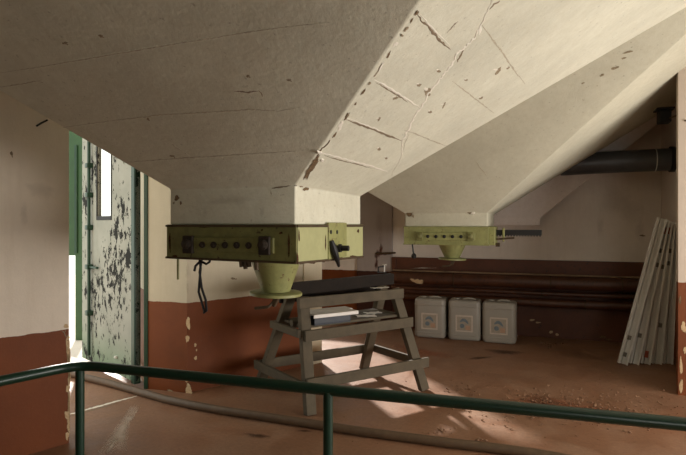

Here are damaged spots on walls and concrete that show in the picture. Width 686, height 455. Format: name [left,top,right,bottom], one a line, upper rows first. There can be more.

spalling [354,10,419,105]
crack [322,0,525,175]
spalling [299,113,350,191]